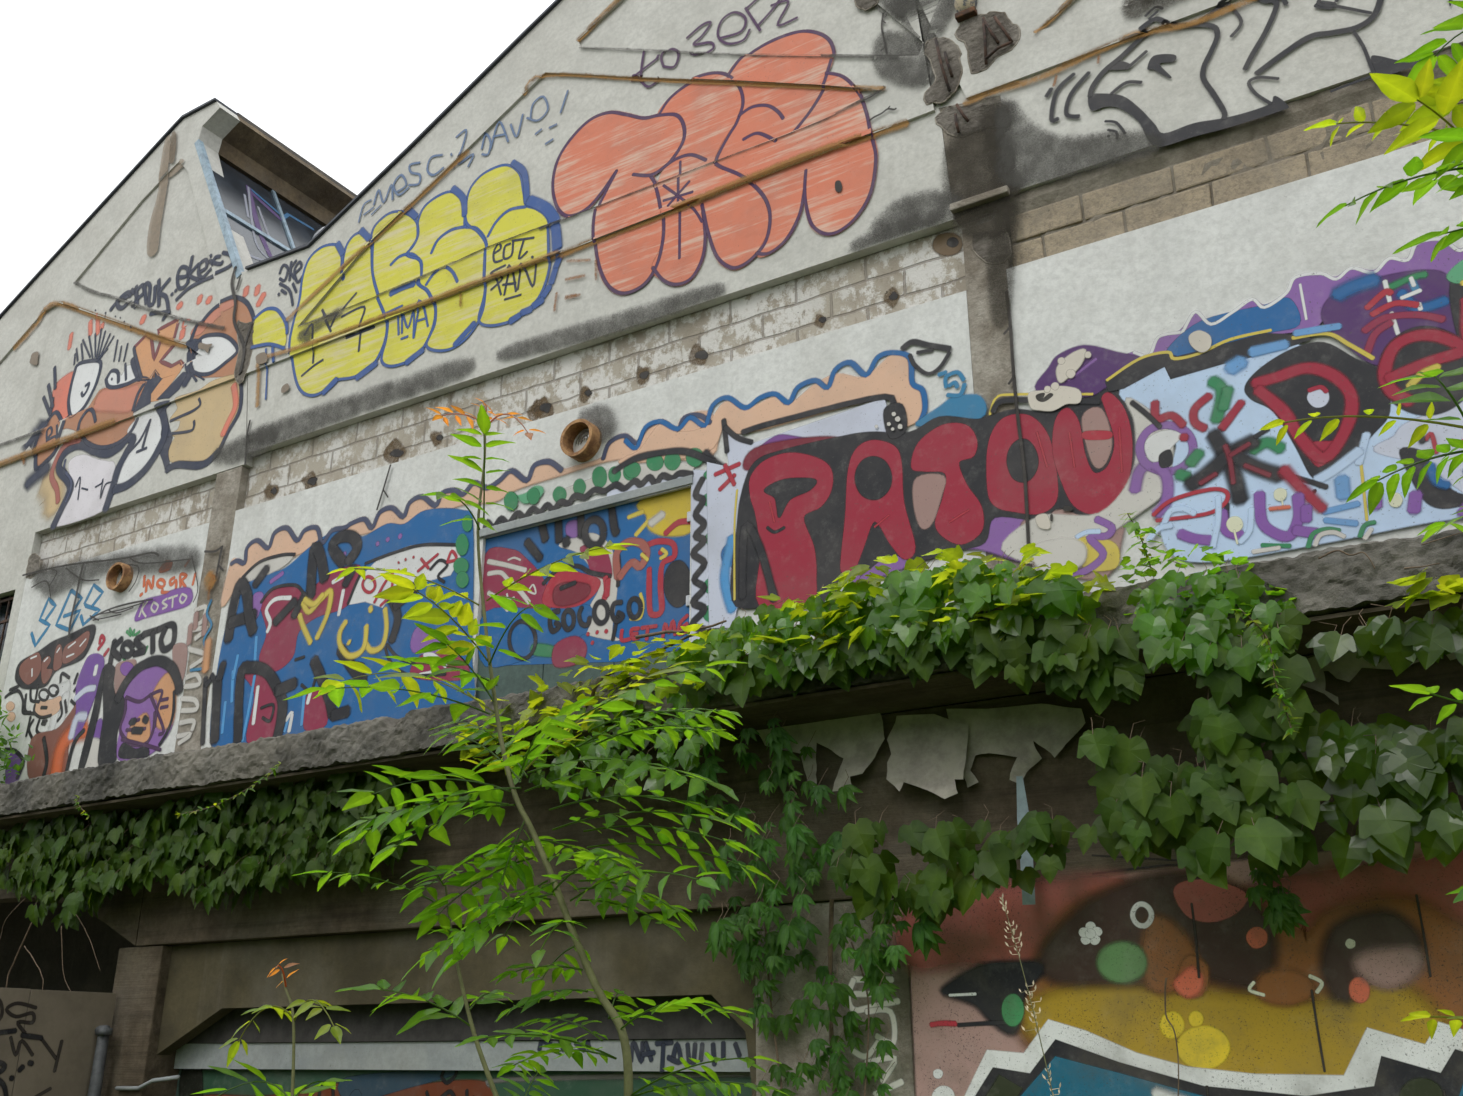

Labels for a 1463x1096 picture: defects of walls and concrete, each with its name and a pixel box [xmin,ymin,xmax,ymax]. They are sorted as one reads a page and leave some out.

leakage [298,0,955,343]
leakage [850,97,1162,326]
leakage [496,283,724,359]
leakage [213,358,474,464]
peeling [756,704,1085,805]